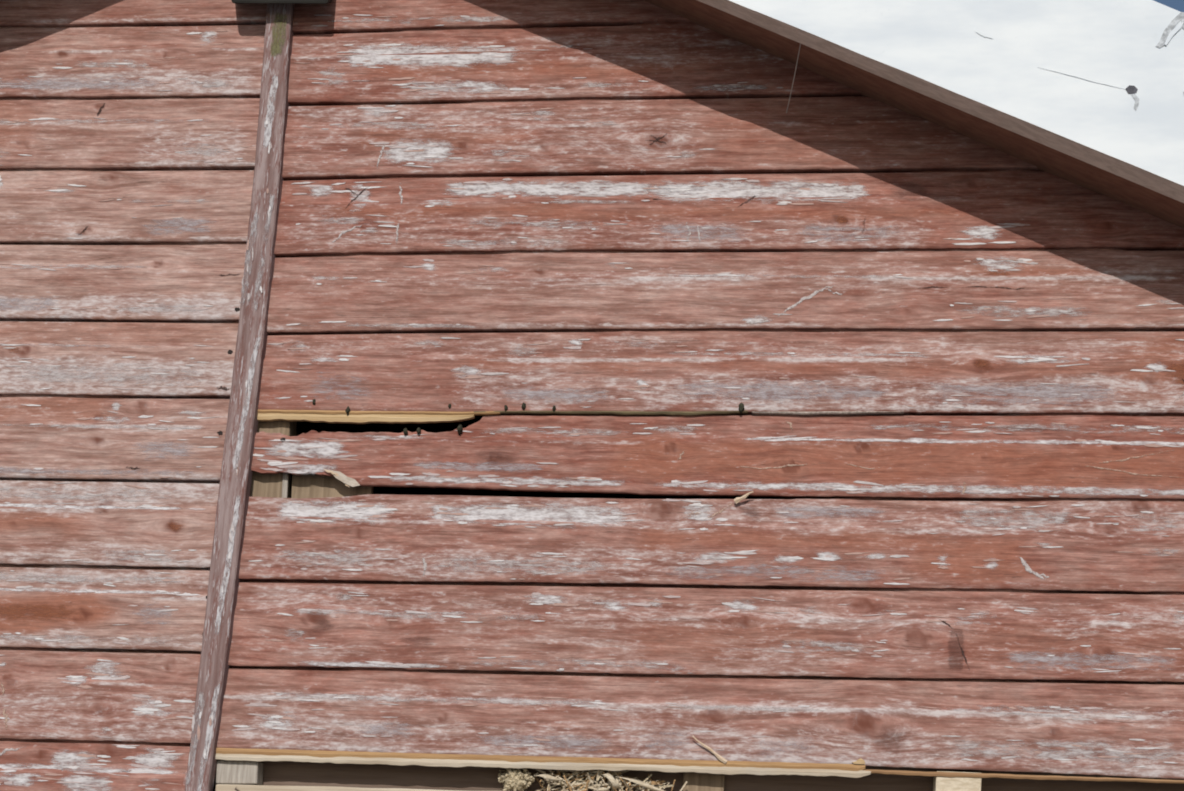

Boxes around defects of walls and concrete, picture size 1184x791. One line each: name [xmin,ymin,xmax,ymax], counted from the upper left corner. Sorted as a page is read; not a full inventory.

peeling [308,43,529,95]
peeling [175,76,278,162]
peeling [424,178,868,207]
peeling [233,337,426,476]
peeling [280,499,397,523]
peeling [421,500,639,528]
peeling [663,480,1184,548]
peeling [215,497,240,633]
peeling [677,550,910,585]
peeling [0,685,220,791]
peeling [231,692,436,740]
peeling [950,736,1175,767]